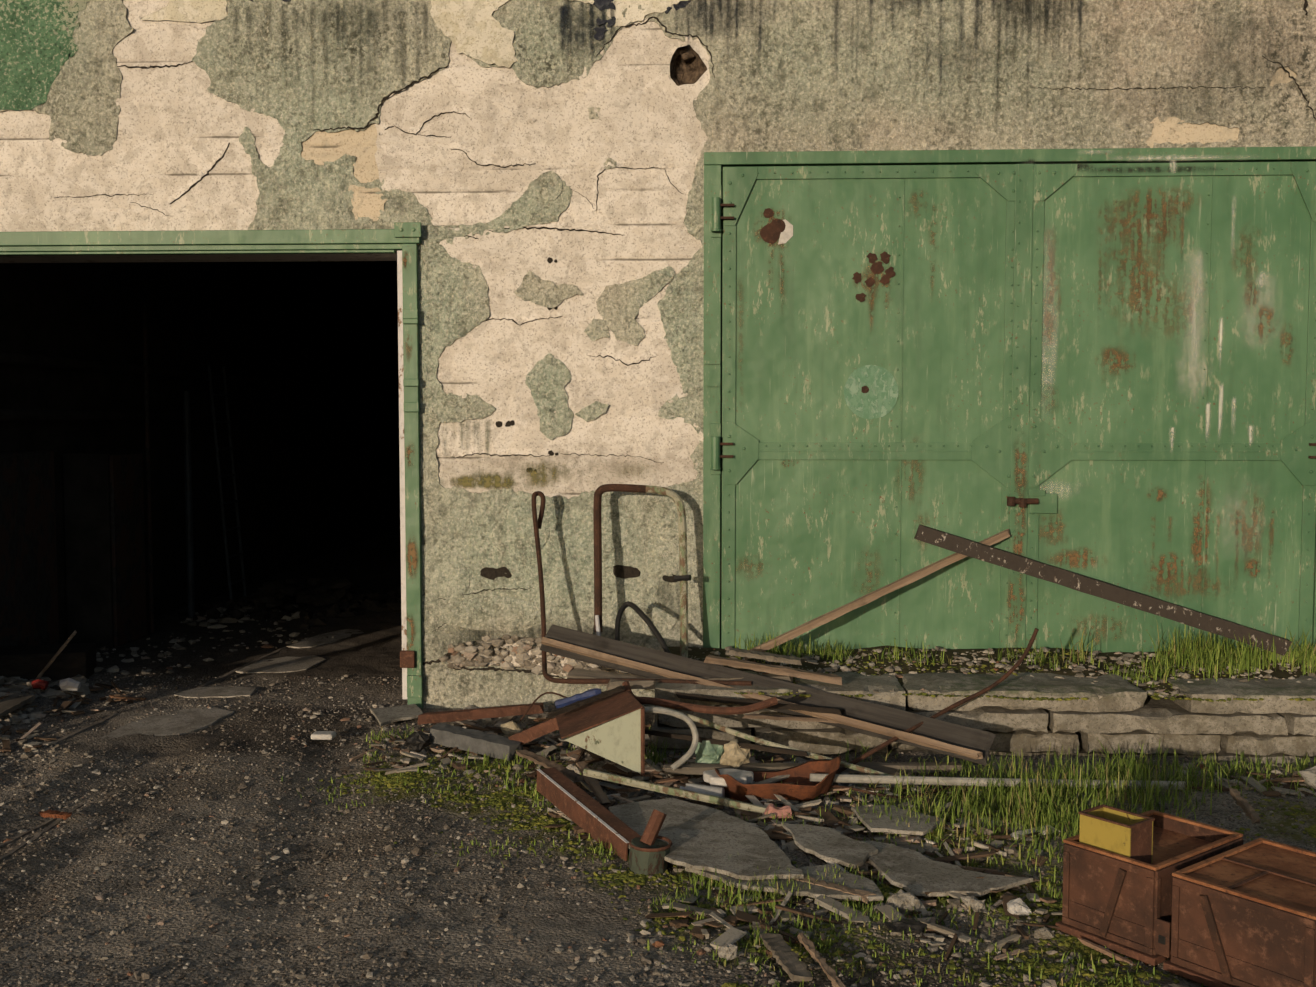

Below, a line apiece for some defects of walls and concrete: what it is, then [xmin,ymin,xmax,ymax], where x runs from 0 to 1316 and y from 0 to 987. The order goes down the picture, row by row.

leakage [559,0,613,51]
leakage [688,0,738,38]
flaking render [0,0,286,232]
crack [56,141,230,216]
flaking render [301,16,711,499]
corrosion [852,251,895,321]
corrosion [1120,254,1161,314]
spalling [480,567,512,580]
spalling [613,565,641,579]
corrosion [1152,488,1209,592]